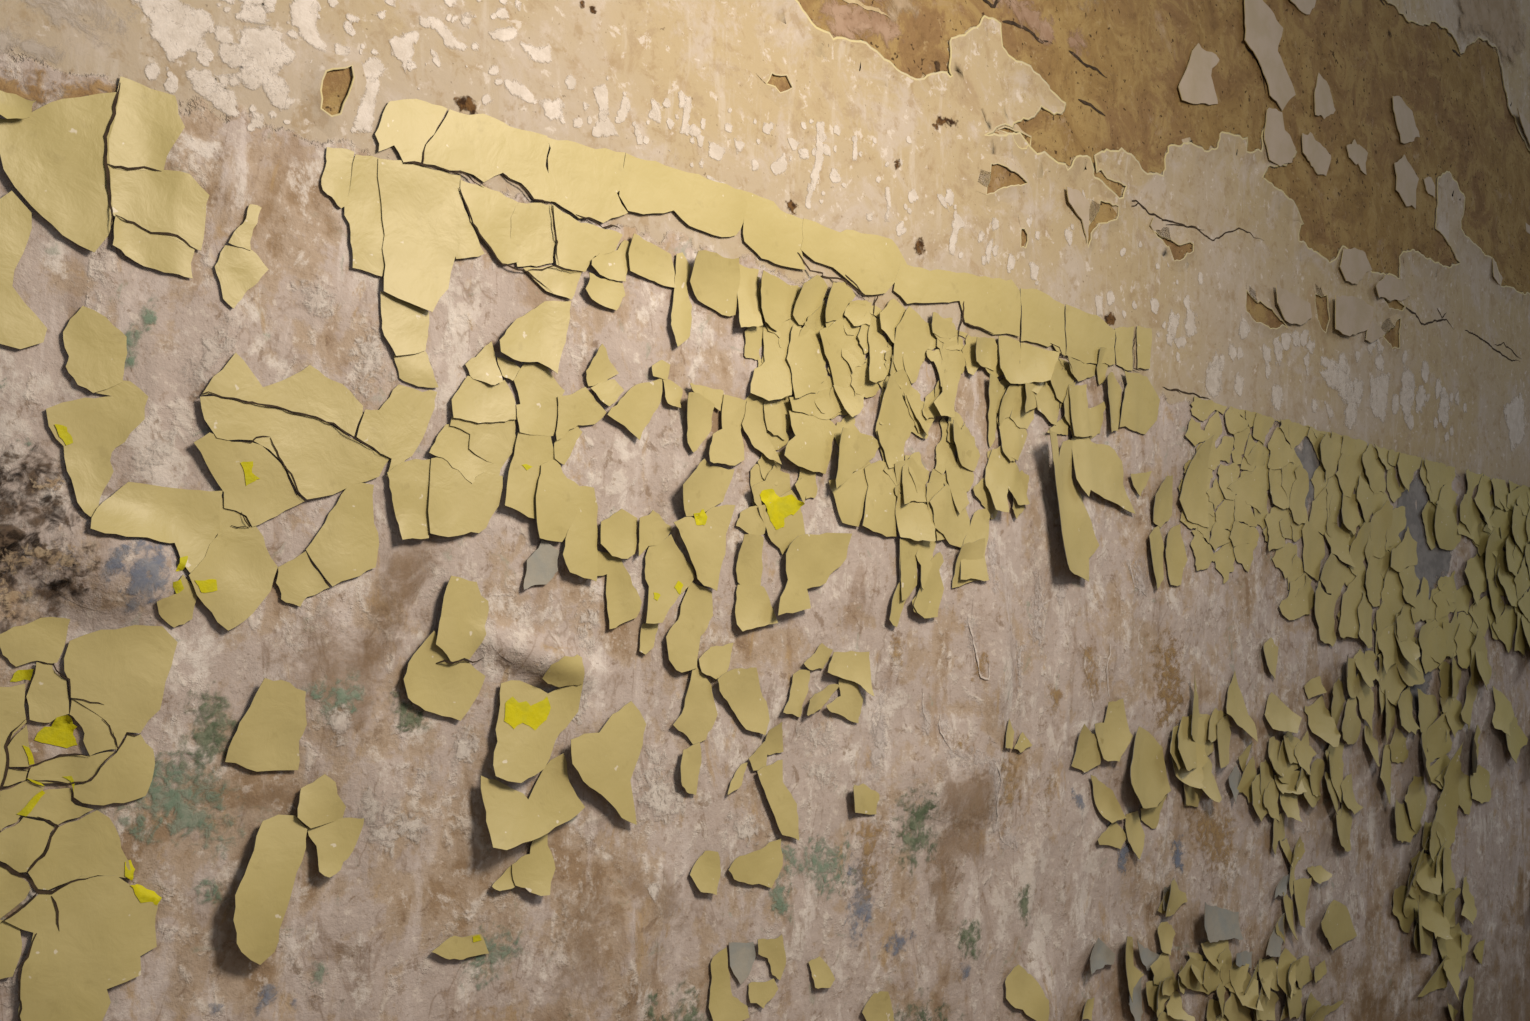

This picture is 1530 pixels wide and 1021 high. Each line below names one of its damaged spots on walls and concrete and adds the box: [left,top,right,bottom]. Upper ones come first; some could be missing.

spalling [695,0,1530,359]
water stain [350,325,396,398]
water stain [0,443,176,633]
peeling [0,48,1160,1021]
crack [0,661,141,1021]
water stain [359,786,429,857]
water stain [418,725,480,777]